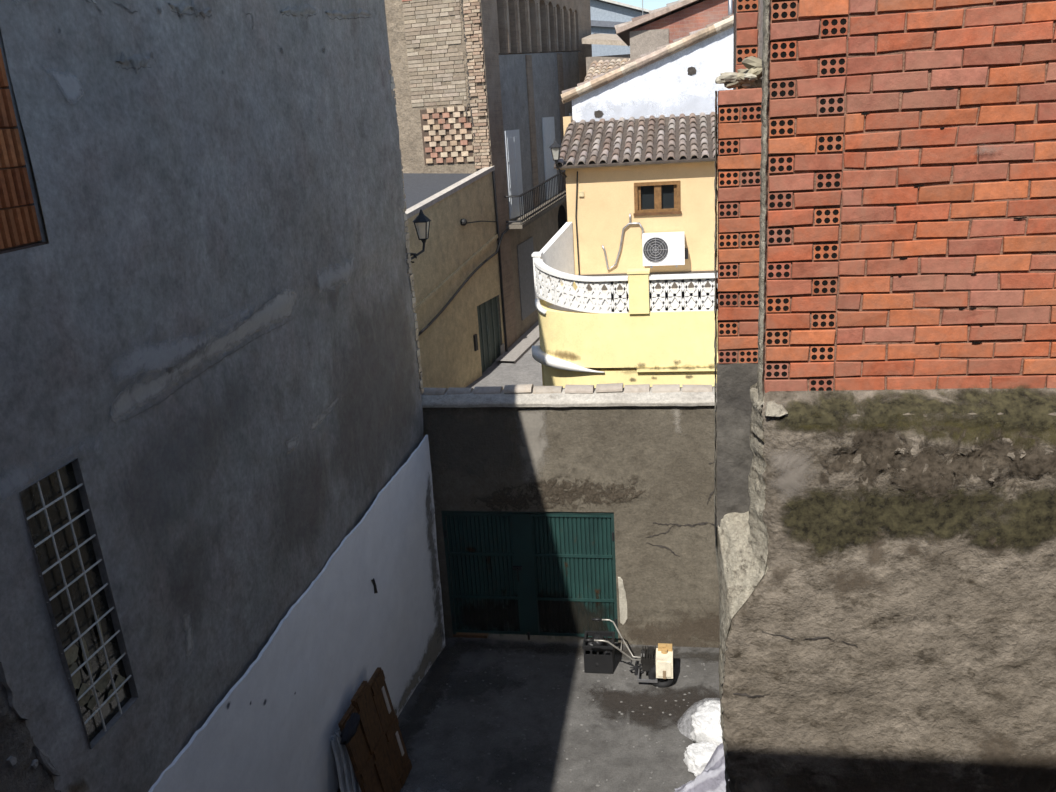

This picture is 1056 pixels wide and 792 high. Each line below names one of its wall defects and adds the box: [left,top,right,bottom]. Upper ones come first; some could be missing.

peeling [110,290,295,429]
leakage [777,386,1056,432]
spalling [474,476,645,511]
crack [649,488,717,556]
spalling [748,383,769,575]
leakage [781,487,1056,563]
spalling [0,662,61,792]
spalling [718,590,732,792]